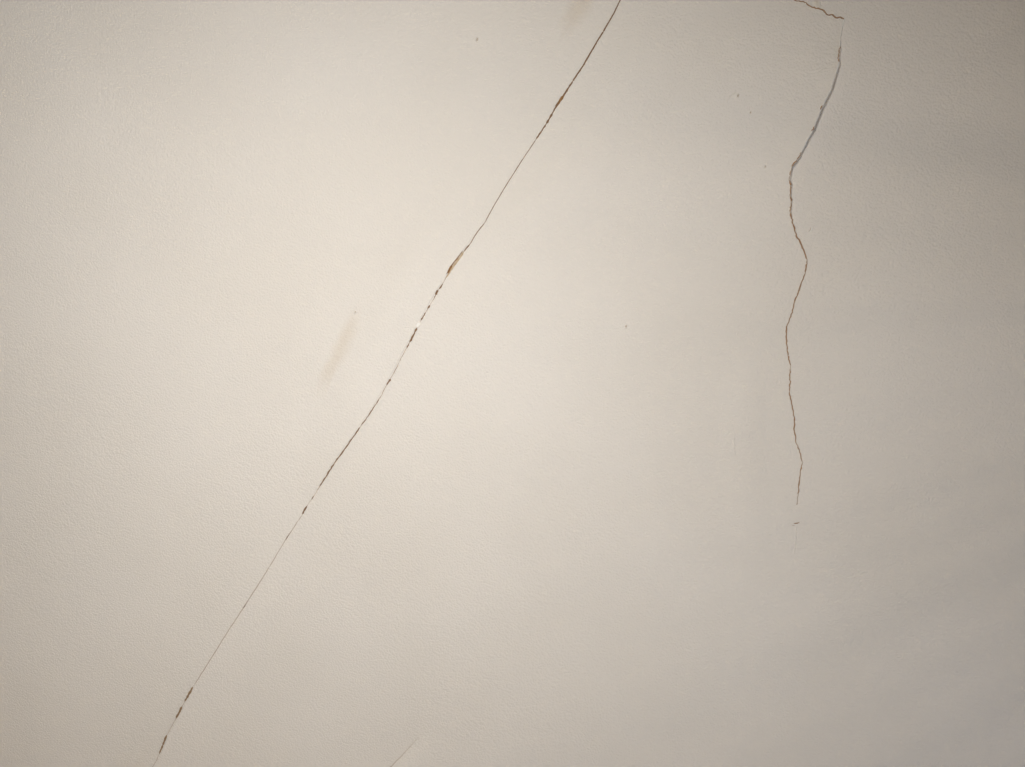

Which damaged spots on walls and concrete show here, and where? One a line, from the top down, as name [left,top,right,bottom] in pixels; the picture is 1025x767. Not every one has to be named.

crack [794,0,844,19]
crack [153,0,625,766]
crack [785,153,807,558]